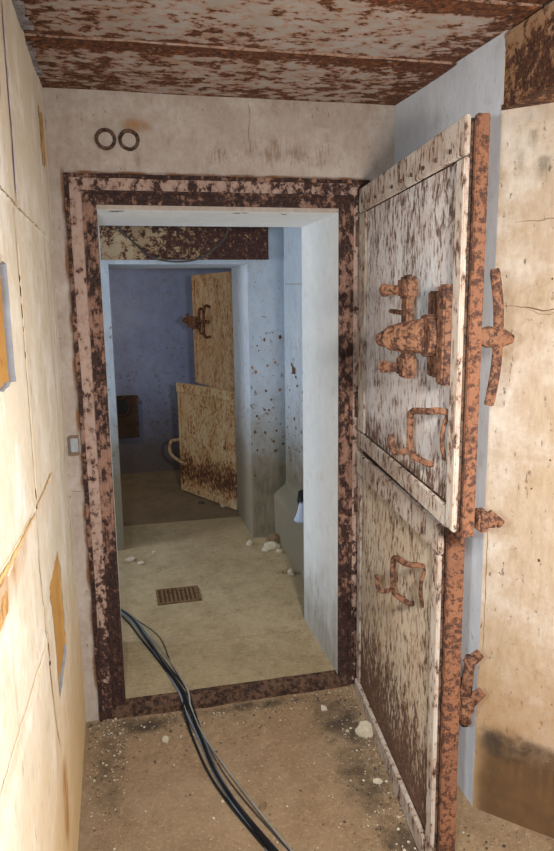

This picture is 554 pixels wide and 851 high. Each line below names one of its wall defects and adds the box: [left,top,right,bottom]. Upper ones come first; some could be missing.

crack [512,305,554,315]
water stain [480,733,554,838]